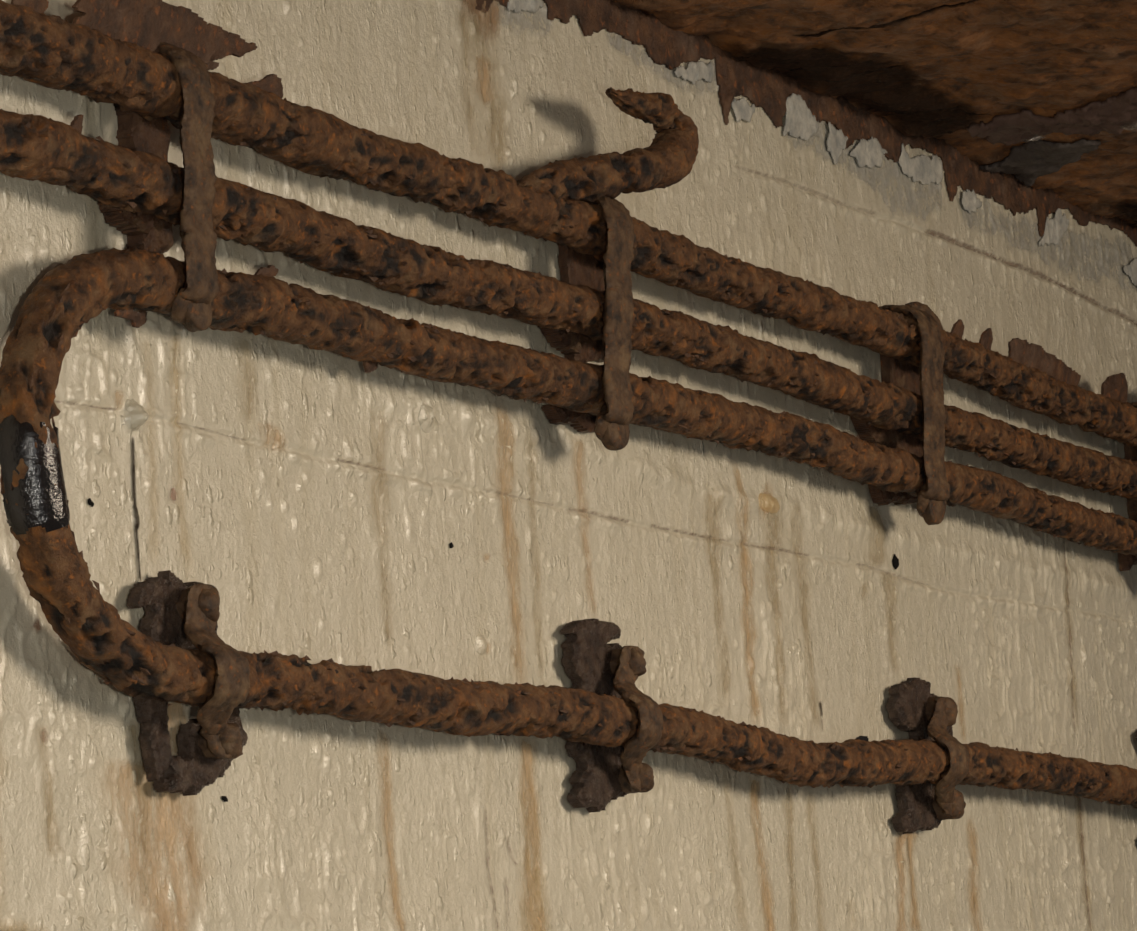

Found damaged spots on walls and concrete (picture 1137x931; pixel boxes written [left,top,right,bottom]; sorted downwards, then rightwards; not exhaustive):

corrosion [72,0,257,71]
crack [796,0,977,38]
corrosion [248,74,283,98]
peeling [469,0,1137,289]
corrosion [114,308,147,328]
corrosion [950,319,964,338]
corrosion [979,328,993,350]
corrosion [1008,338,1081,386]
corrosion [1101,373,1128,403]
corrosion [741,540,759,712]
corrosion [119,766,194,931]
corrosion [523,743,544,931]